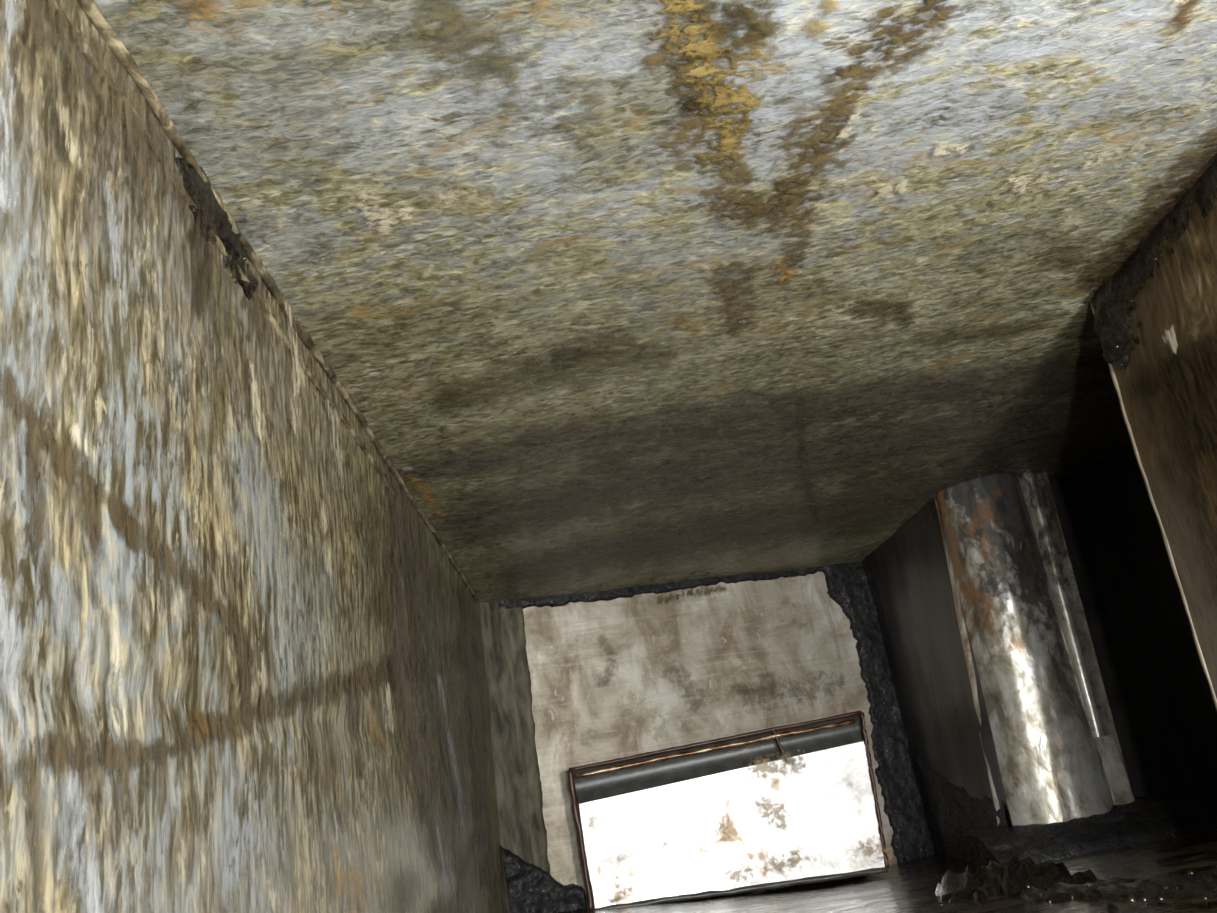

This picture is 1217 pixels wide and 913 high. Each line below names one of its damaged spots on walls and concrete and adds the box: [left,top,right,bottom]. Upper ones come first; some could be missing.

corrosion [638,0,774,219]
corrosion [774,0,963,205]
leakage [435,334,678,413]
leakage [708,262,760,335]
leakage [854,300,1051,344]
peeling [1163,326,1178,353]
leakage [1132,335,1217,604]
leakage [366,350,1130,913]